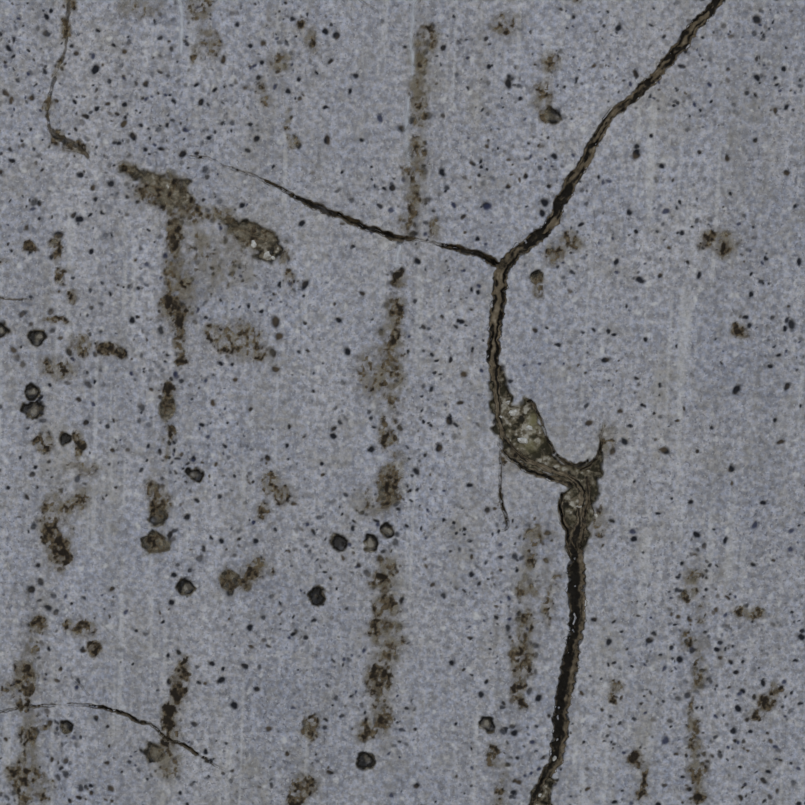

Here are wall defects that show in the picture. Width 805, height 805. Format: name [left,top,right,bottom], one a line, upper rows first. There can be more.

crack [46,3,89,158]
crack [233,0,724,805]
crack [0,703,218,768]